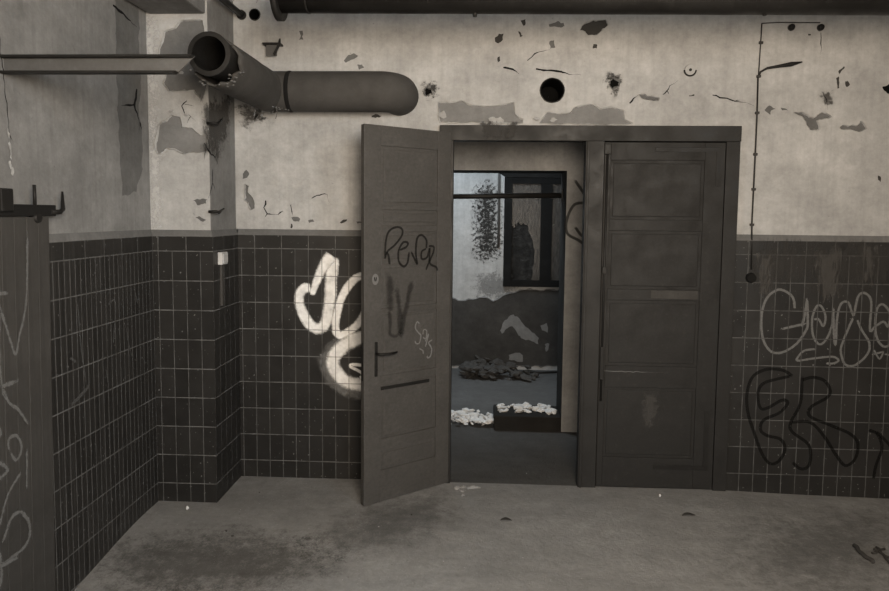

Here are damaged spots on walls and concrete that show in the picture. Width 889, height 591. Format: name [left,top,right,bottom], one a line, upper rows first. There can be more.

flaking render [580,19,608,48]
flaking render [158,19,206,100]
flaking render [154,109,207,154]
flaking render [422,81,523,124]
flaking render [534,104,632,125]
flaking render [606,73,622,96]
flaking render [765,106,832,130]
flaking render [452,288,559,368]